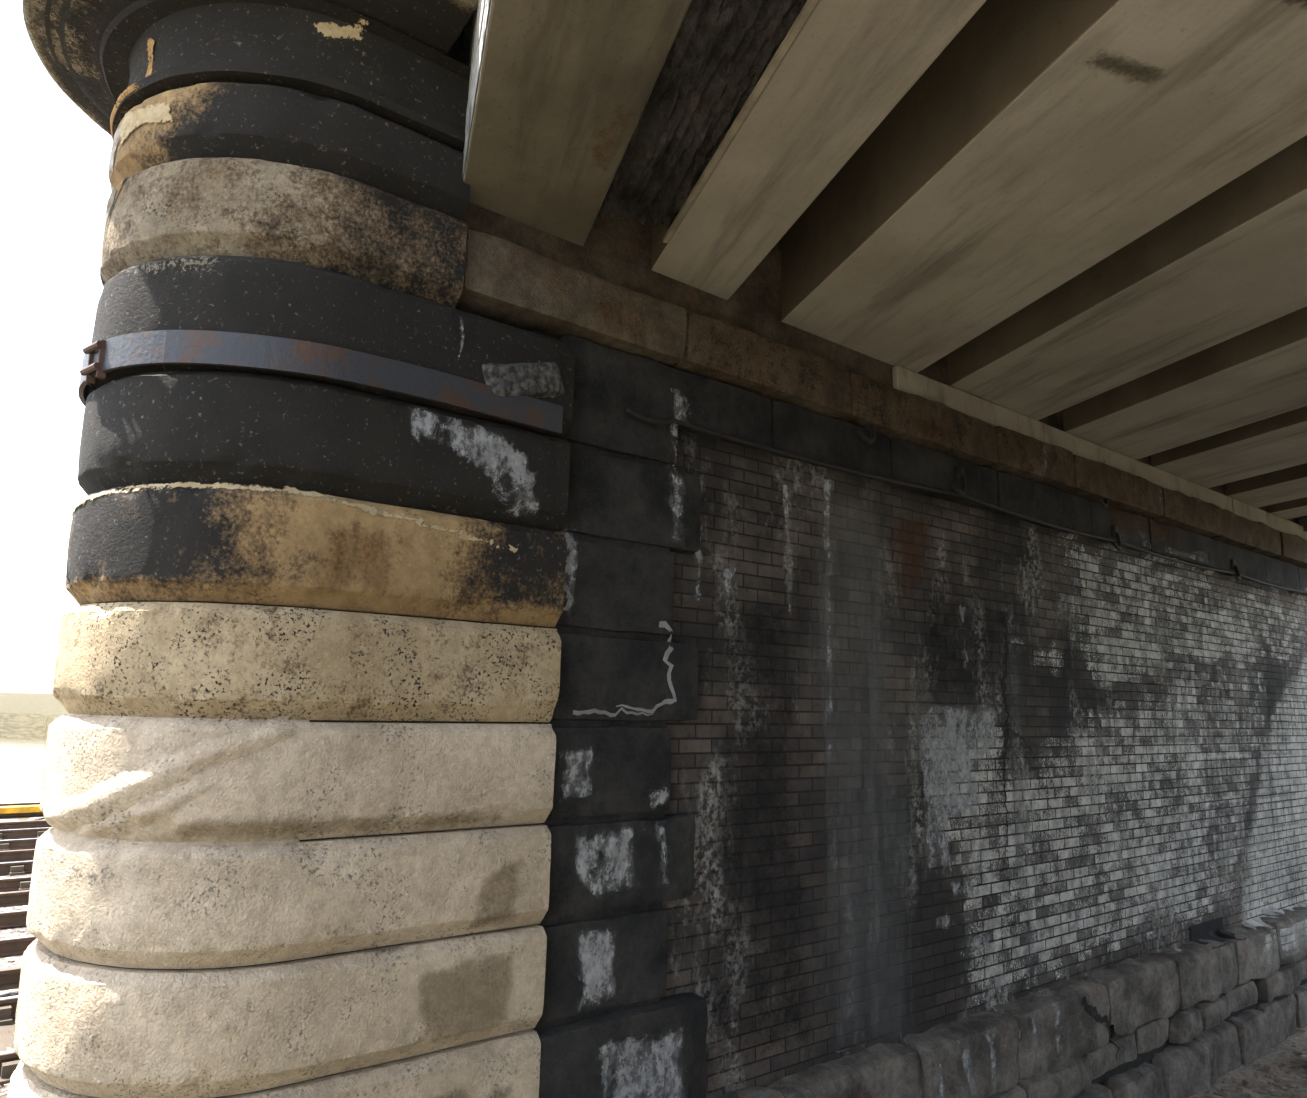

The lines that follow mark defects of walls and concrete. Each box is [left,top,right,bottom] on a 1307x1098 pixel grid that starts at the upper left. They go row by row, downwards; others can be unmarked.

peeling [108,38,173,192]
peeling [462,0,490,179]
crack [100,177,129,281]
leakage [783,485,793,589]
leakage [912,525,1307,1006]